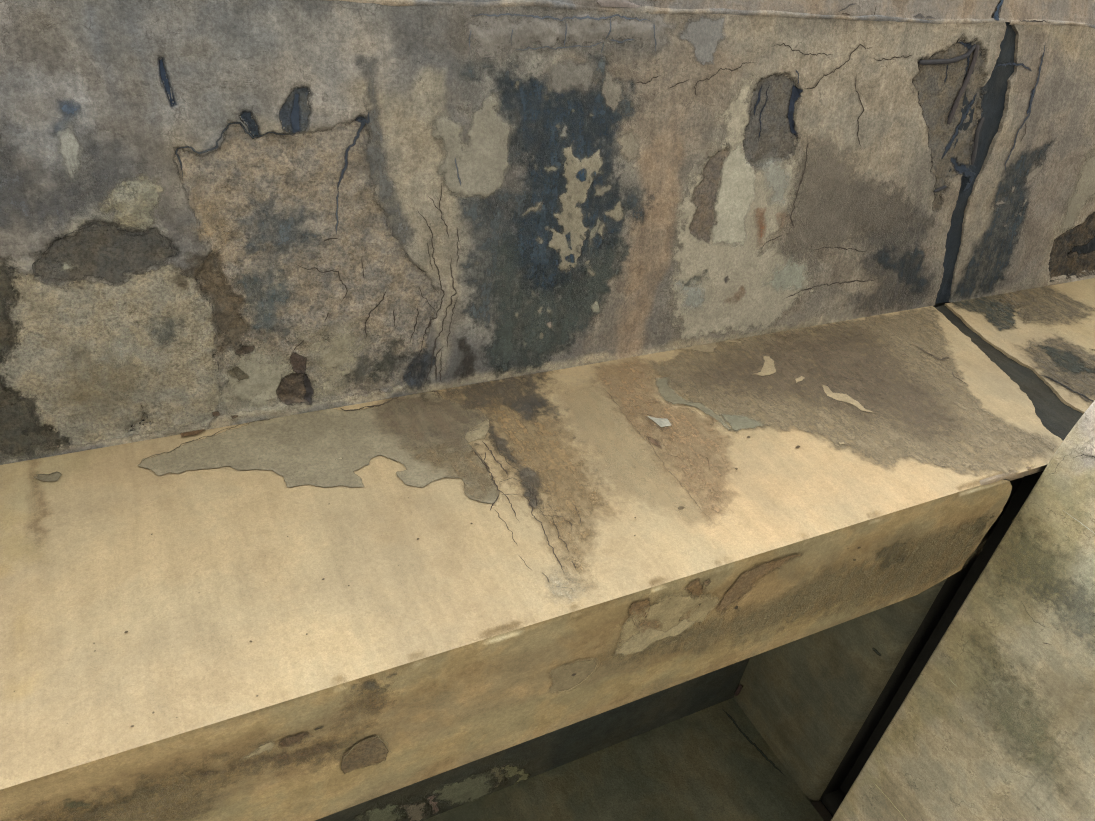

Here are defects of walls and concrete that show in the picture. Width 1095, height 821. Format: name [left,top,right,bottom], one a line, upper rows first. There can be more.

spalling [0,87,510,504]
crack [298,263,364,322]
crack [324,112,370,241]
crack [365,183,459,383]
water stain [403,53,654,570]
crack [463,9,912,146]
spalling [689,150,730,242]
spalling [743,70,803,168]
spalling [912,37,986,211]
spalling [1048,212,1095,282]
crack [1041,375,1094,402]
water stain [22,674,397,821]